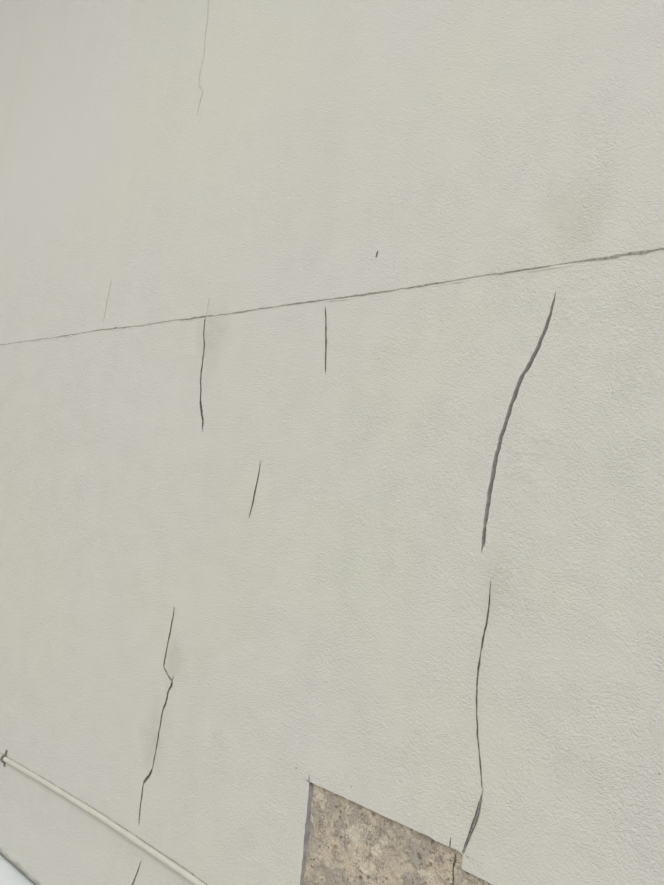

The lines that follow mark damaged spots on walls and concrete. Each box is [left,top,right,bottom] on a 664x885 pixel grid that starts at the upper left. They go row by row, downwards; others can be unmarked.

crack [249,461,261,516]
crack [0,248,664,430]
crack [481,292,556,554]
crack [139,610,174,817]
spalling [300,781,493,885]
crack [449,580,491,885]